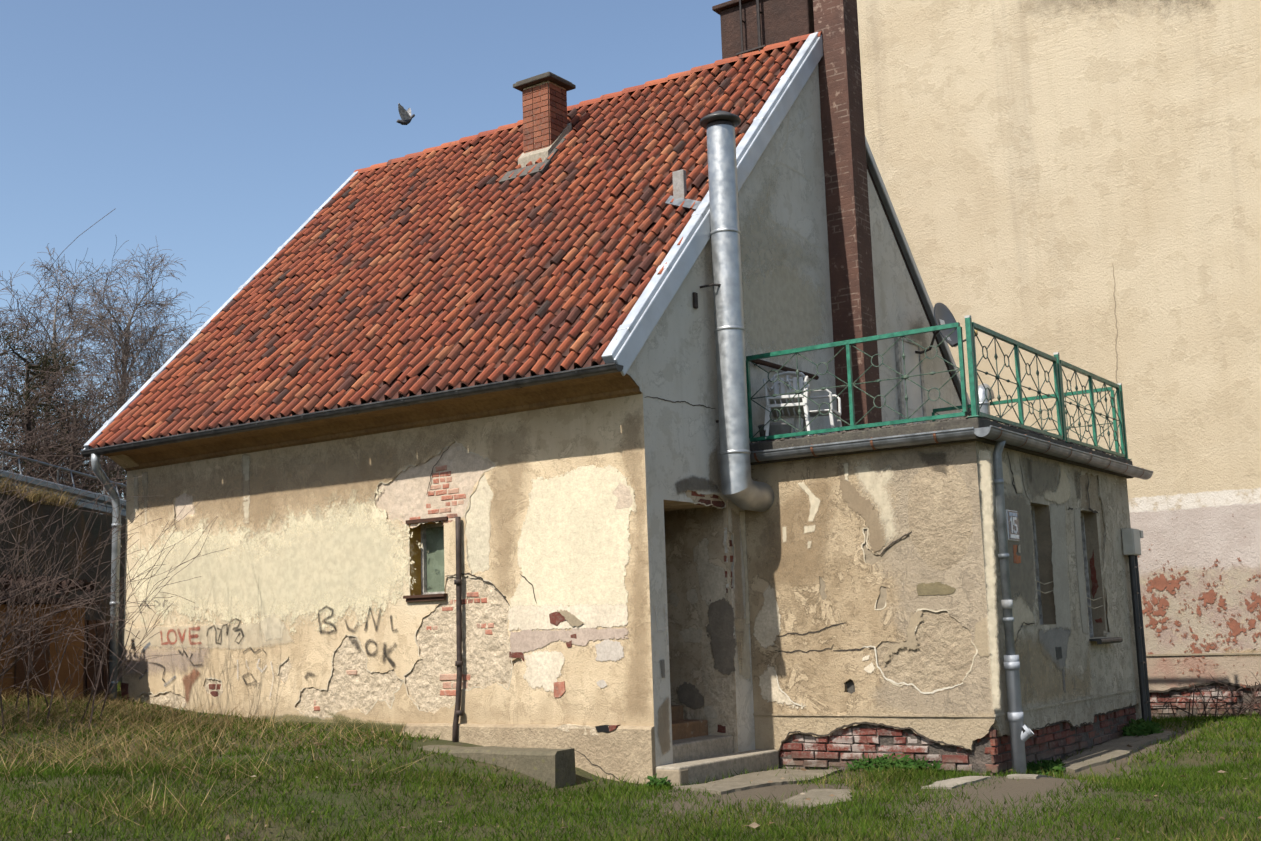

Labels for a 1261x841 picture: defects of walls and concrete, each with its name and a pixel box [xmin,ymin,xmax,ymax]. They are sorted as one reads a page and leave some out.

peeling [120,441,637,719]
peeling [666,533,735,607]
flaking render [679,627,738,737]
peeling [753,583,782,649]
peeling [759,664,806,709]
crack [775,622,865,653]
flaking render [861,528,912,565]
flaking render [862,582,978,694]
peeling [1003,593,1035,695]
flaking render [1043,467,1113,634]
flaking render [1138,544,1261,719]
flaking render [778,705,1136,776]